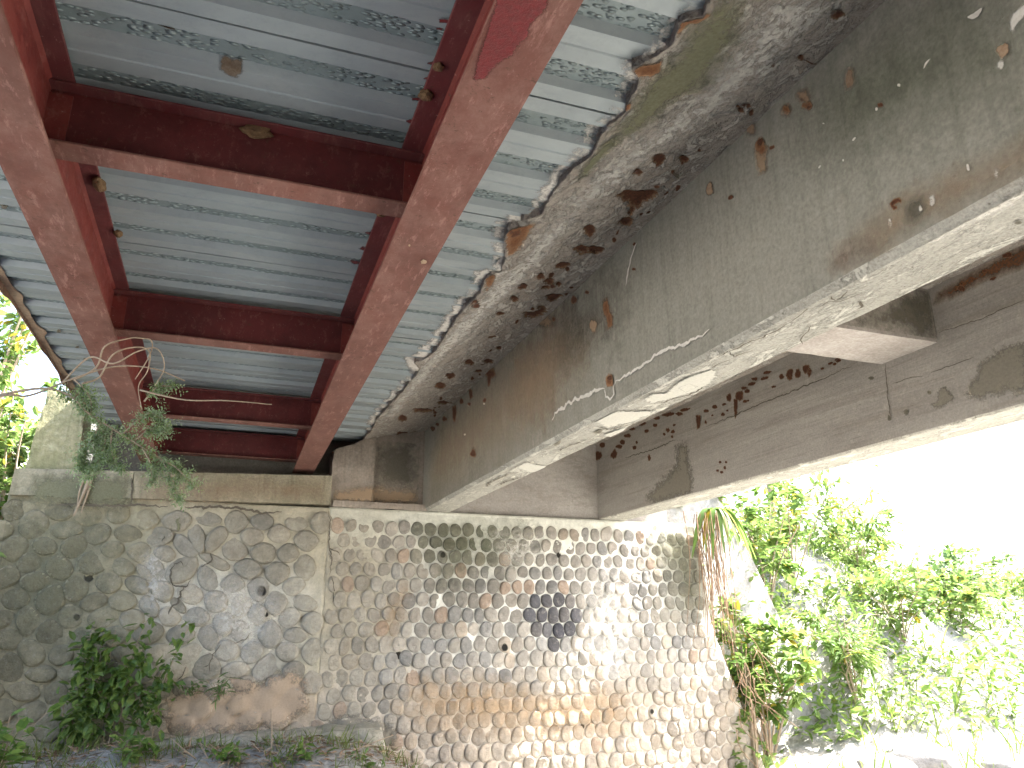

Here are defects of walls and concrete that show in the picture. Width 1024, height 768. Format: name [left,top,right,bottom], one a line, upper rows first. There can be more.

peeling [473,0,548,81]
corrosion [505,225,533,255]
corrosion [935,246,1024,302]
crack [552,329,709,420]
peeling [595,358,841,461]
crack [885,357,973,415]